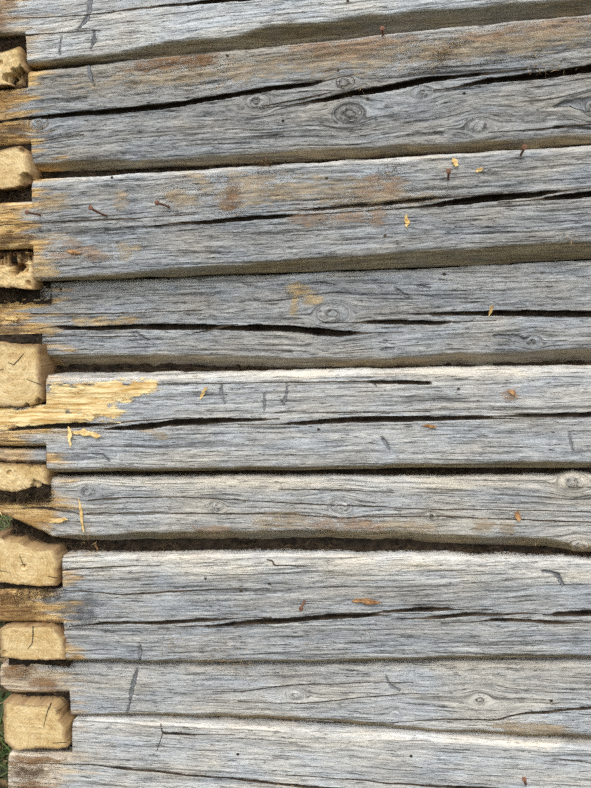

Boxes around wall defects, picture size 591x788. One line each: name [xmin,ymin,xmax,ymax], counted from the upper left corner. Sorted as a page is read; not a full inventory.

crack [1,0,252,38]
crack [0,64,591,142]
crack [0,187,591,228]
crack [30,310,591,337]
crack [0,353,94,386]
crack [157,380,432,388]
spalling [0,377,158,431]
crack [0,411,591,431]
crack [69,606,591,627]